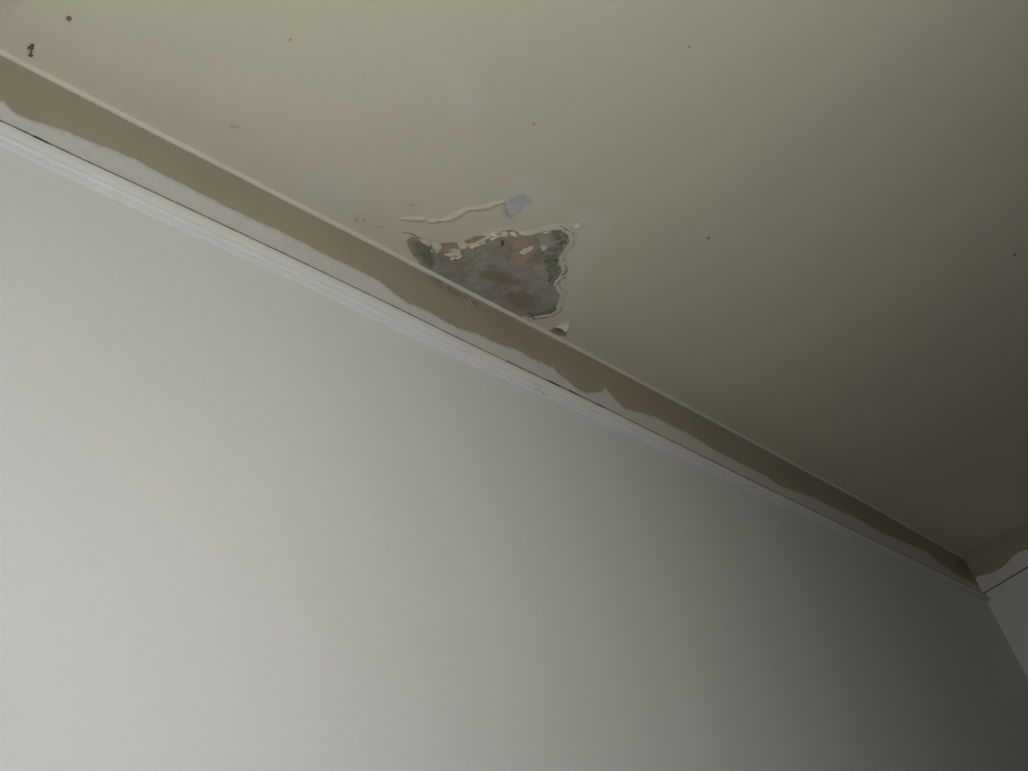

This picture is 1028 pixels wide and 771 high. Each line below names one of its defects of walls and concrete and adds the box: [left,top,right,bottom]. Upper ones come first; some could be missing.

leakage [431,276,481,311]
peeling [0,98,983,593]